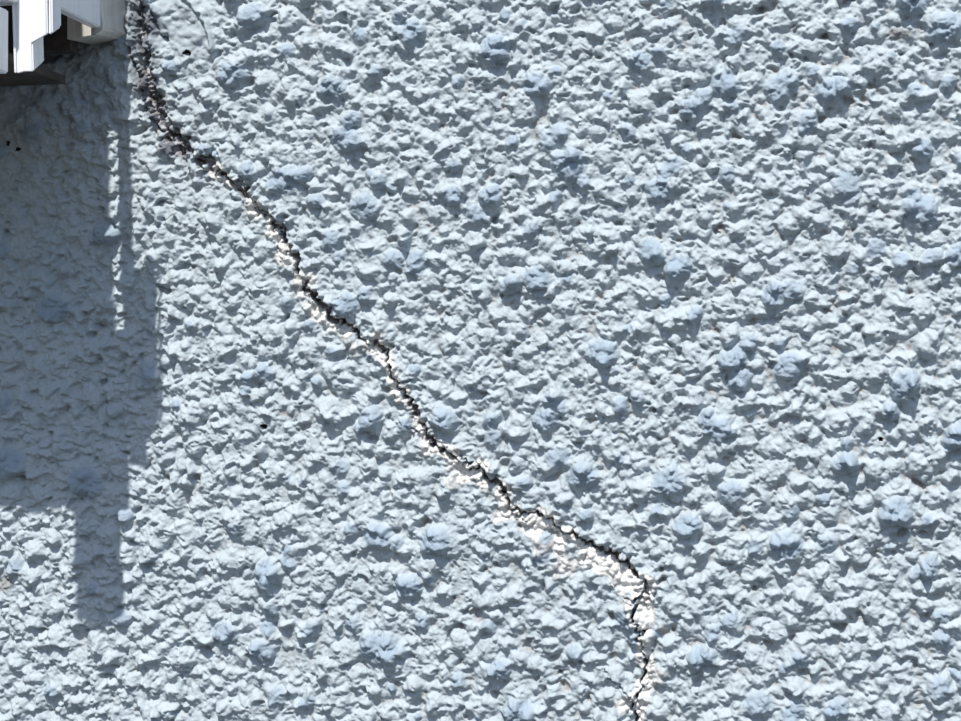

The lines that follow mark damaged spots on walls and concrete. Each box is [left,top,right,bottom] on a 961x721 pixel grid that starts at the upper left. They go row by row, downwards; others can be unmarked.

crack [128,0,649,721]